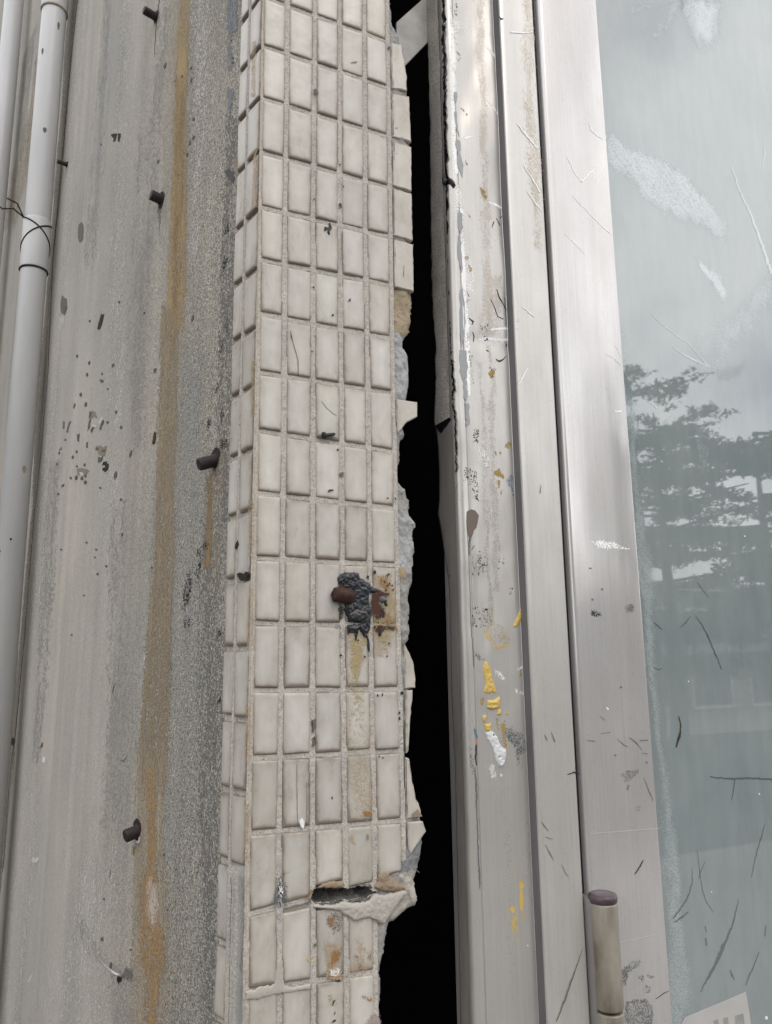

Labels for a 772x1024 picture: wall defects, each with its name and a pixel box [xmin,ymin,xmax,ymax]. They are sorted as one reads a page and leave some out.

spalling [56,393,122,495]
corrosion [127,0,190,1024]
corrosion [201,439,230,588]
spalling [309,481,426,1016]
corrosion [342,567,406,821]